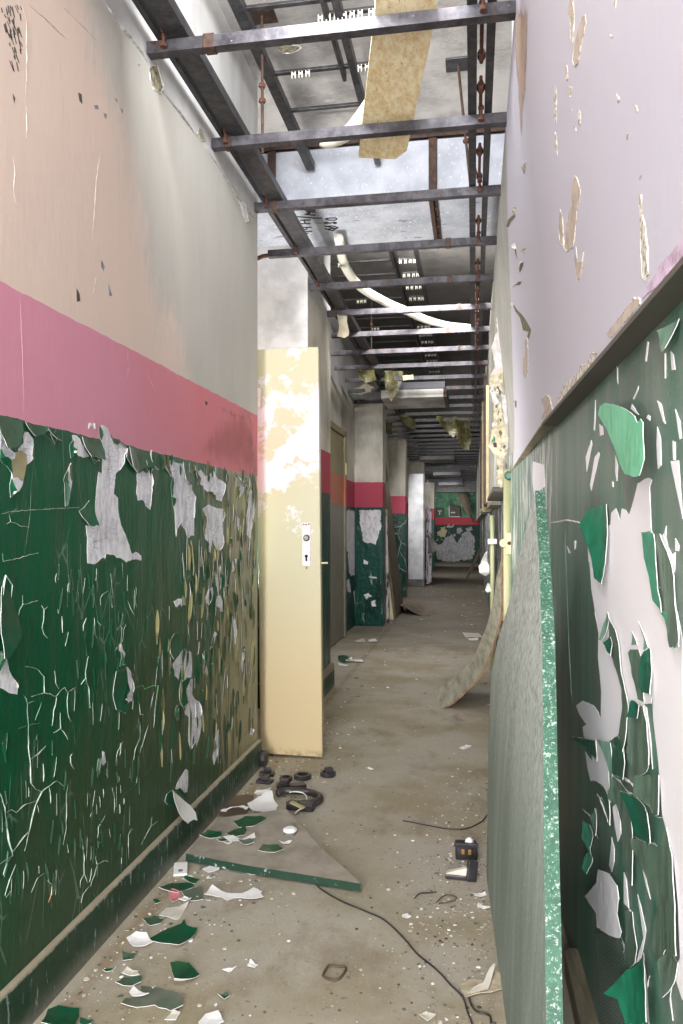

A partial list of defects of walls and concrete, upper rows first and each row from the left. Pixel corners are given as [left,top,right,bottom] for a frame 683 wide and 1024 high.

peeling [554,0,587,155]
peeling [558,175,584,281]
peeling [607,194,683,337]
peeling [541,352,598,422]
peeling [645,319,679,378]
peeling [532,461,545,493]
peeling [347,509,382,607]
peeling [436,524,475,562]
crack [0,462,159,903]
peeling [0,415,257,883]
peeling [567,386,683,1024]
peeling [4,851,29,904]